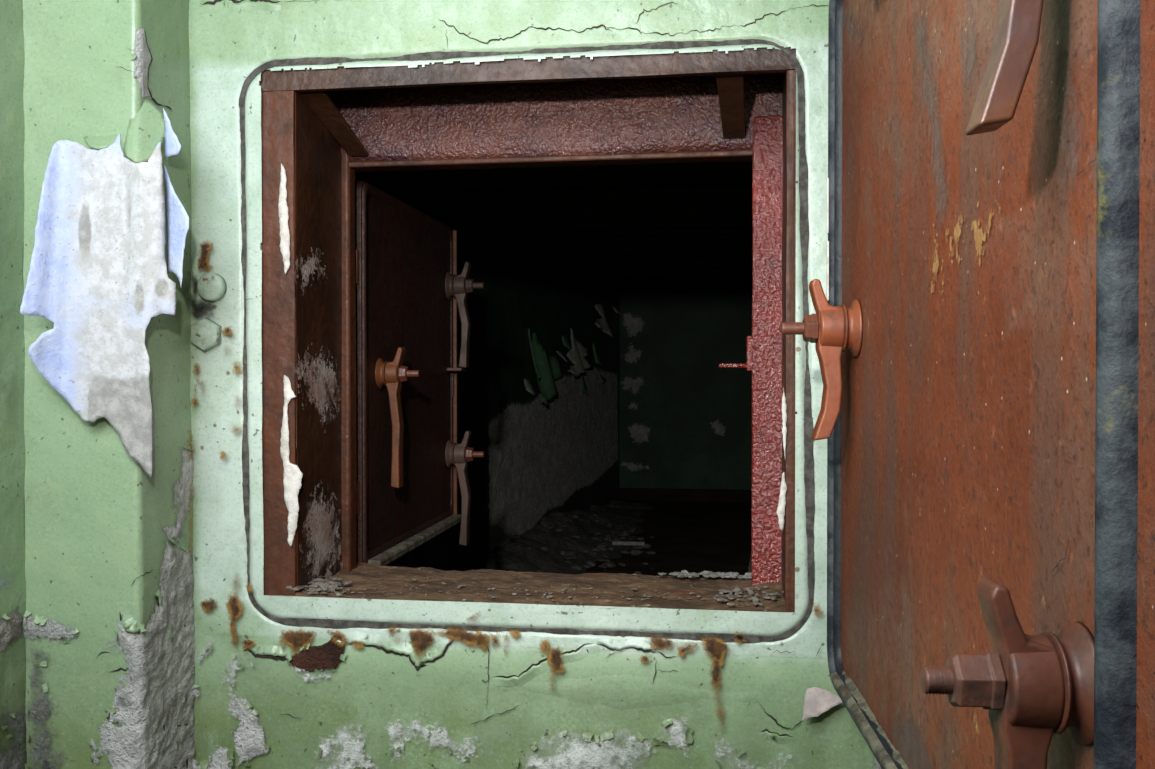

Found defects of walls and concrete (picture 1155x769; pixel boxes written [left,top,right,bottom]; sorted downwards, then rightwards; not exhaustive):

crack [440,2,829,44]
peeling [20,28,189,478]
peeling [278,163,325,293]
peeling [280,343,343,581]
flaking render [88,444,270,769]
corrosion [200,582,255,649]
crack [240,638,291,661]
corrosion [281,629,363,652]
crack [343,630,453,676]
corrosion [387,613,521,654]
crack [471,635,676,724]
corrosion [641,632,746,691]